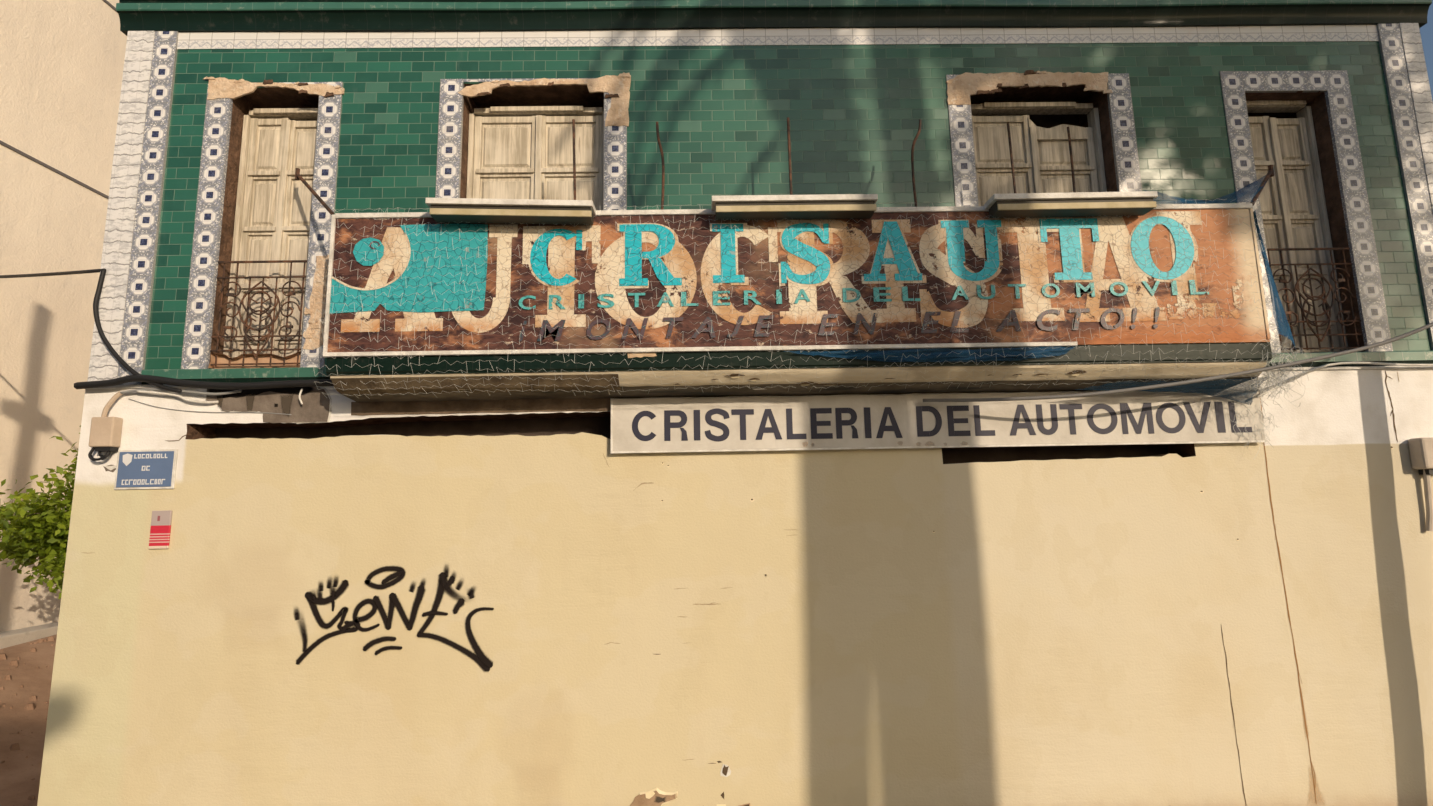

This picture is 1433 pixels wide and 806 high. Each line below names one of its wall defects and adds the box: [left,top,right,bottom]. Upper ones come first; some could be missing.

spalling [203,76,344,100]
spalling [458,73,631,127]
spalling [946,70,1113,105]
crack [1257,377,1317,804]
crack [1221,626,1247,805]
flaking render [630,788,678,806]
peeling [717,761,750,806]